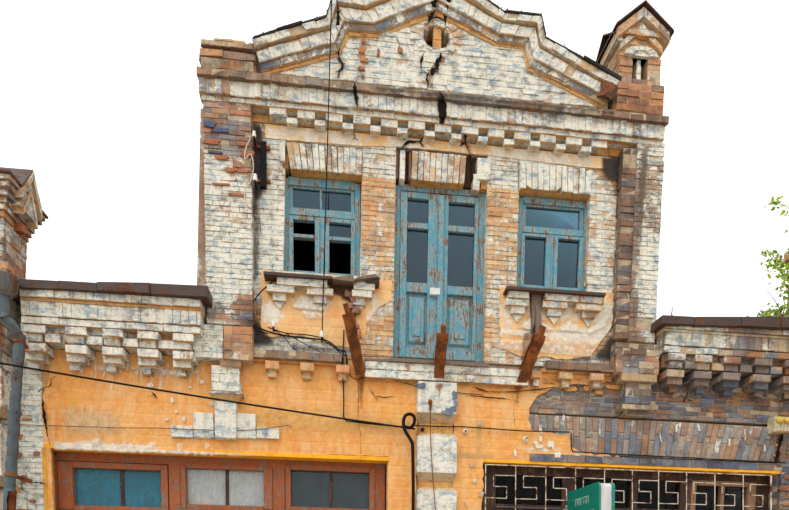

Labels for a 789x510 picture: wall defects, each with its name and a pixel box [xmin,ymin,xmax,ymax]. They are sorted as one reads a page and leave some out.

crack [424,0,451,29]
crack [334,0,359,108]
crack [396,37,473,182]
peeling [494,330,533,350]
peeling [540,340,598,356]
flaking render [565,377,621,395]
crack [38,376,55,444]
flaking render [523,424,561,458]
crack [771,434,786,462]